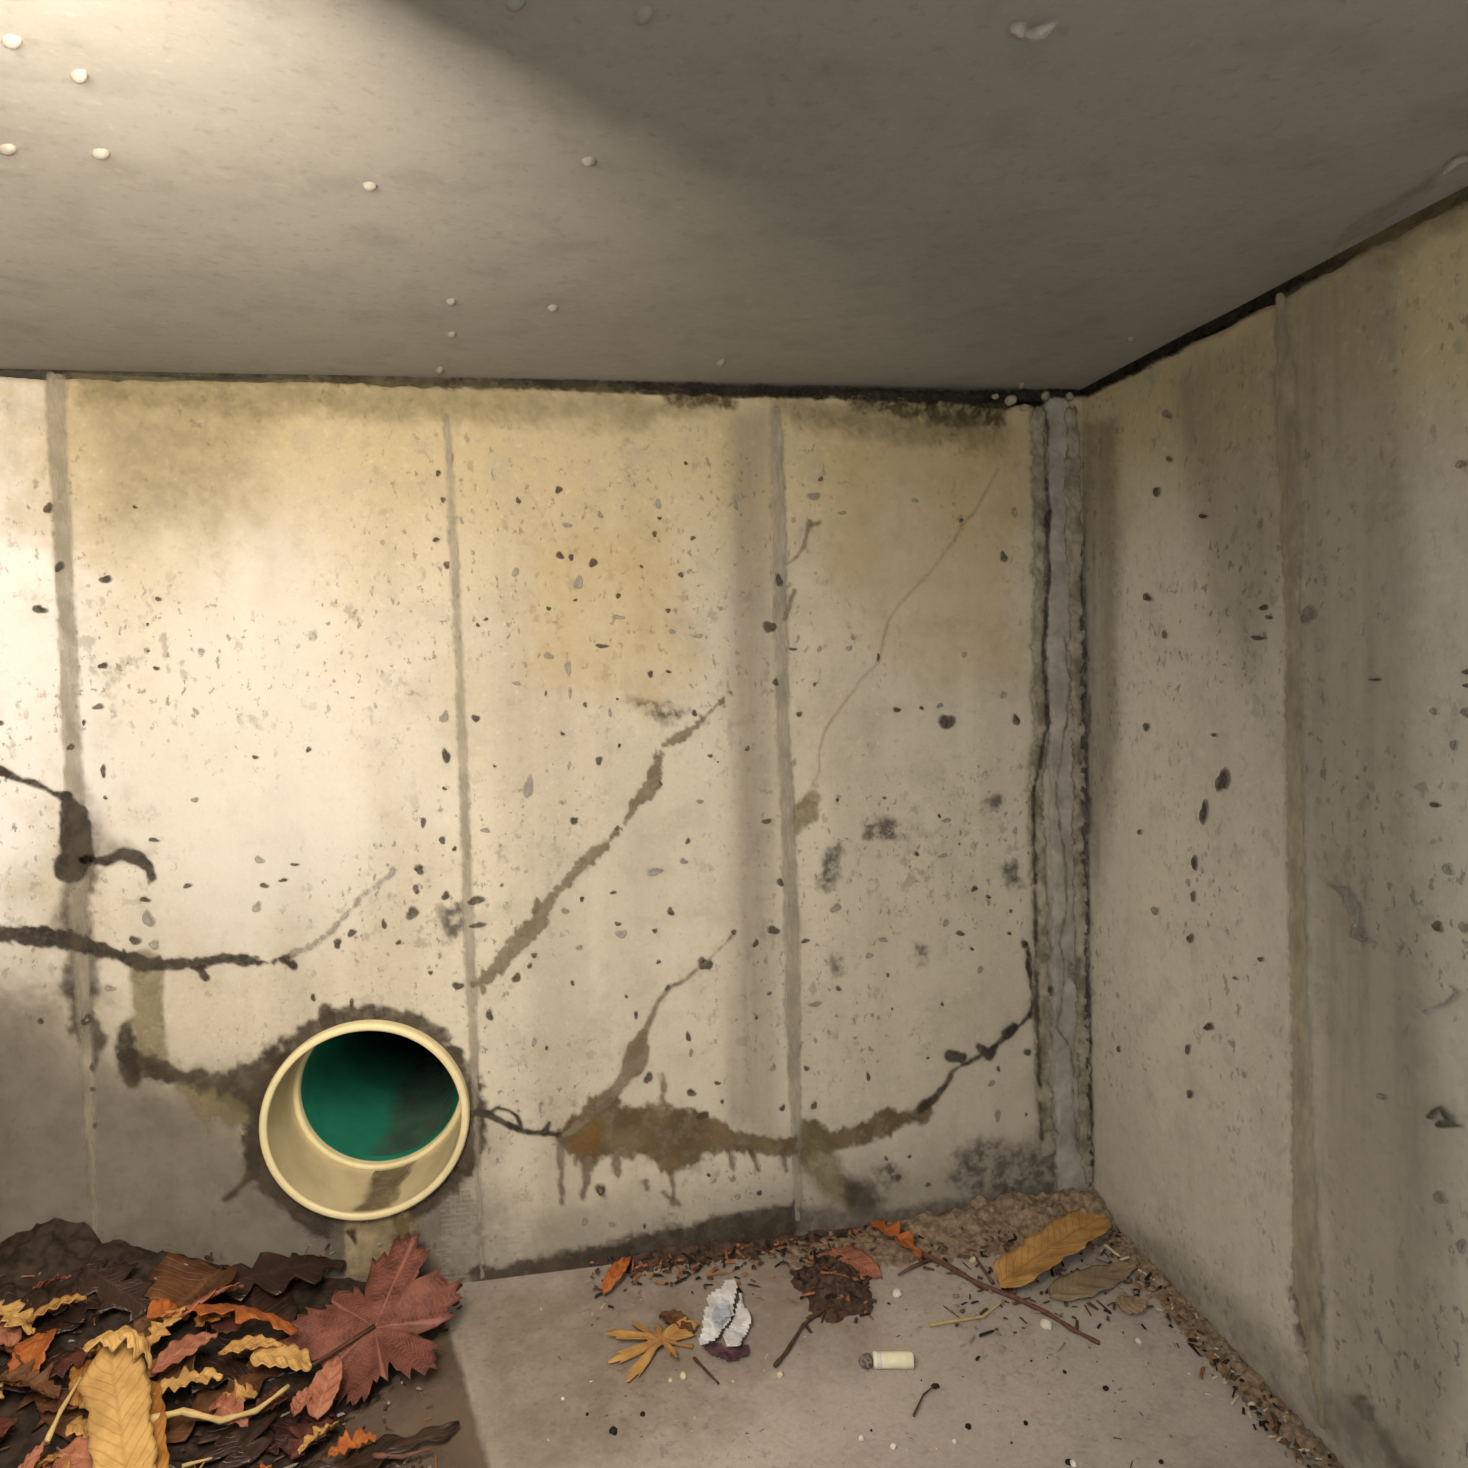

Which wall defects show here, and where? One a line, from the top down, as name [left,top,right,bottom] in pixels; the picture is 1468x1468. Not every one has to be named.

leakage [0,854,1058,1283]
crack [0,186,1468,1166]